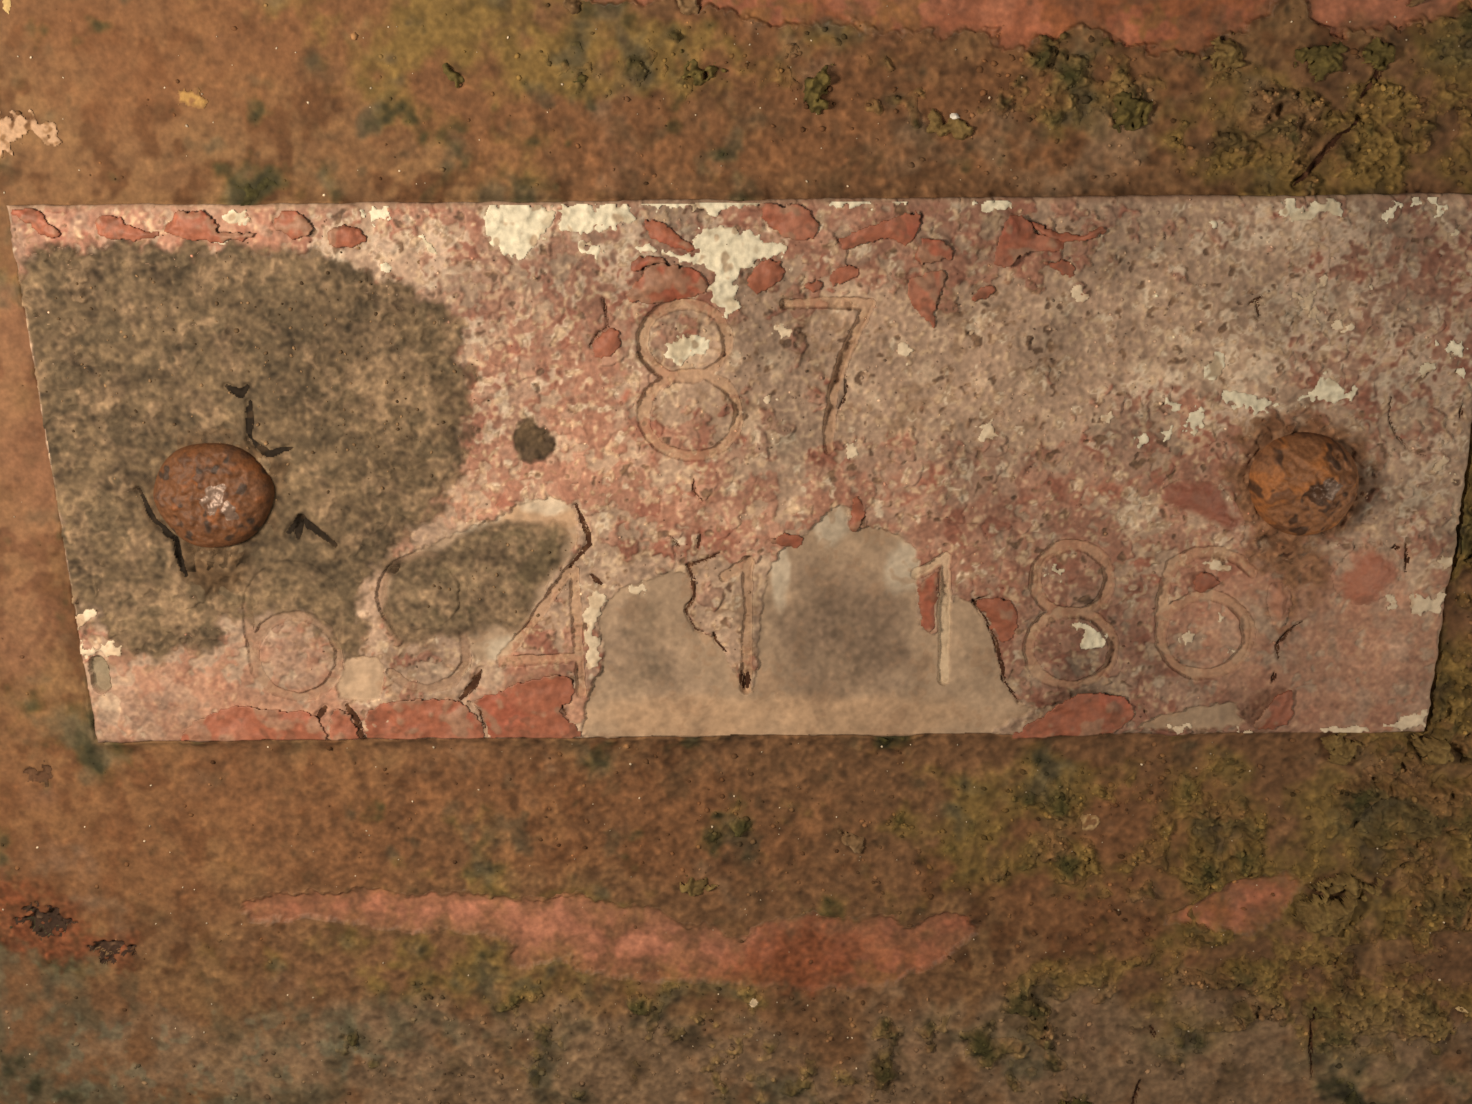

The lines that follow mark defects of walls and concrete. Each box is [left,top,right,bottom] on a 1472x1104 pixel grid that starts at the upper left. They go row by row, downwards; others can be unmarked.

peeling [580,0,1279,61]
peeling [1300,0,1472,42]
peeling [483,203,820,319]
peeling [804,202,954,328]
peeling [972,200,1107,303]
peeling [771,324,792,339]
peeling [897,342,914,366]
peeling [846,440,859,459]
peeling [975,418,999,442]
corrosion [1224,413,1366,615]
peeling [181,495,1294,741]
peeling [1320,709,1428,733]